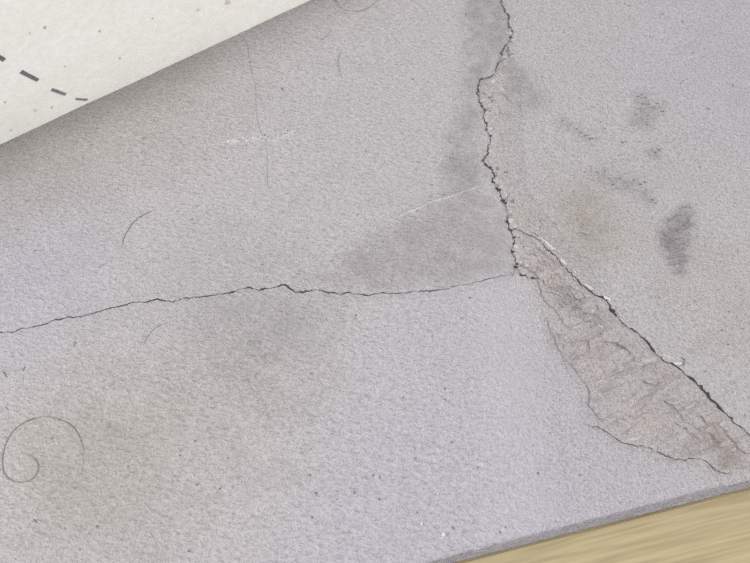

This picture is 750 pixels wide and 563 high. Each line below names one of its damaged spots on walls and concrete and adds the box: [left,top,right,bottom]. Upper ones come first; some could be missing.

crack [0,275,502,333]
crack [476,0,750,474]
spalling [478,32,750,487]